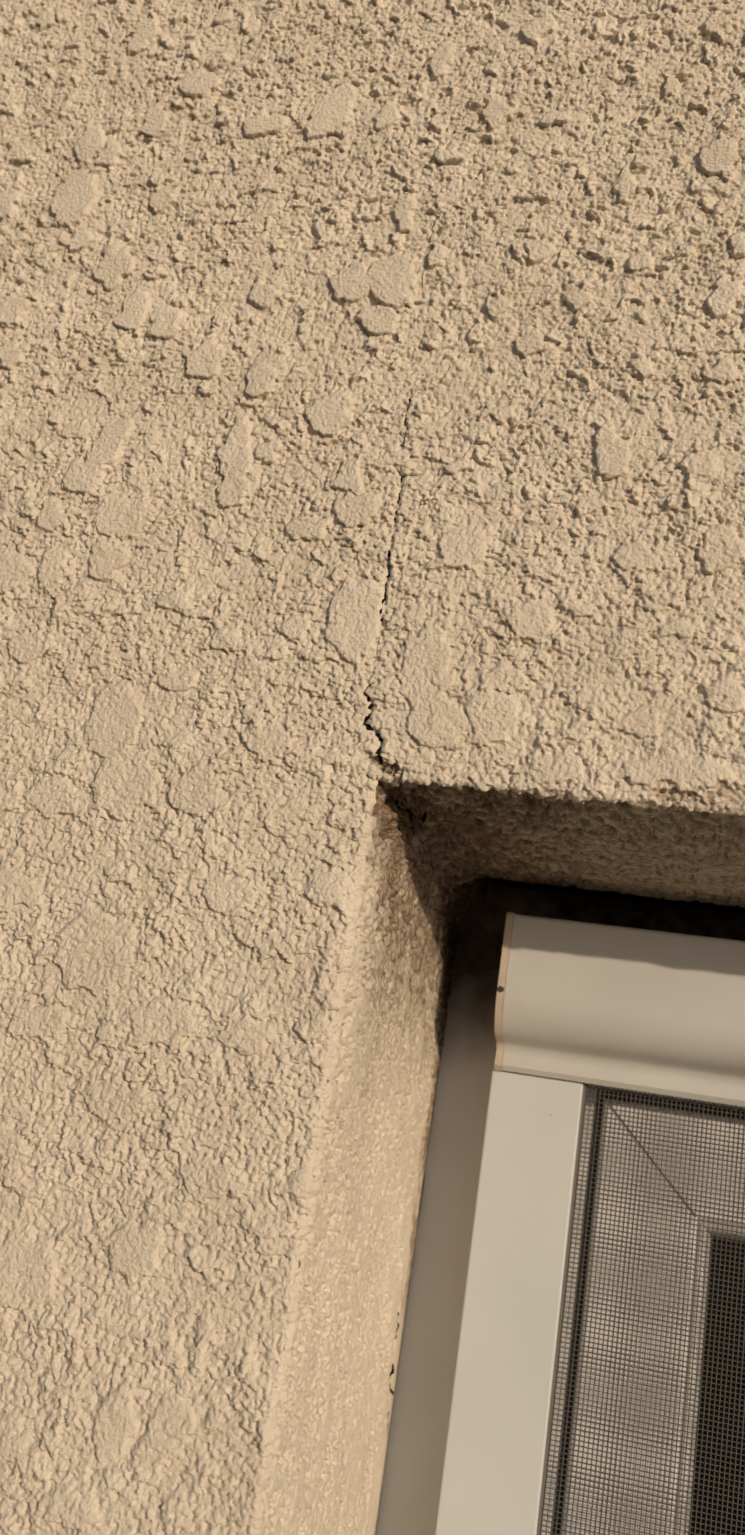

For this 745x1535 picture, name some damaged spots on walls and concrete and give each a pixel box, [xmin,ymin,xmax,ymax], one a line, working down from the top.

crack [363,391,442,844]